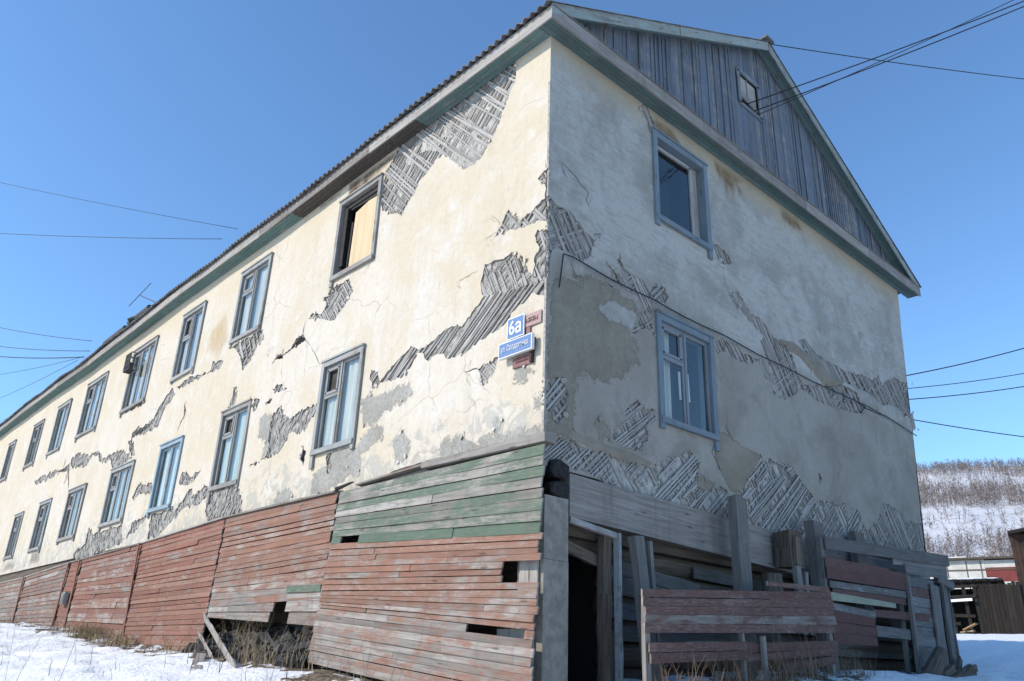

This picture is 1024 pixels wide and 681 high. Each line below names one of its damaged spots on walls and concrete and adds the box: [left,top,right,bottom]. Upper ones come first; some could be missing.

flaking render [35,360,223,485]
flaking render [252,384,317,465]
peeling [697,430,763,492]
flaking render [74,471,242,560]